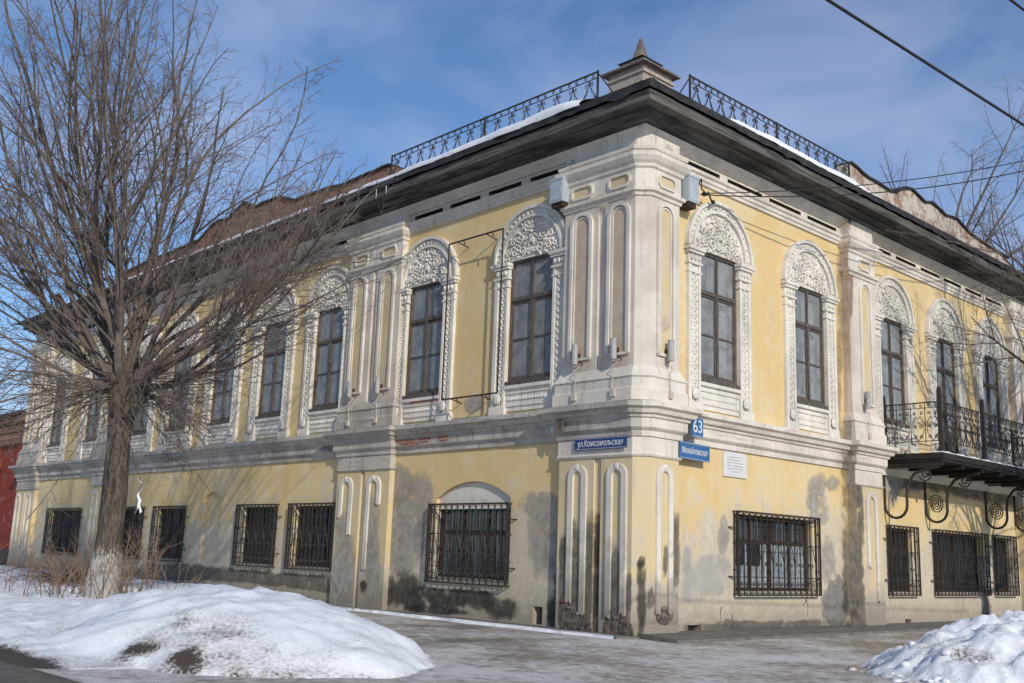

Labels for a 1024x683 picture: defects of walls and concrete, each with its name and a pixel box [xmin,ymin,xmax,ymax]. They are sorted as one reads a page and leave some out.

leakage [130,502,515,619]
leakage [526,492,655,633]
flaking render [559,594,634,636]
leakage [663,517,681,585]
leakage [846,421,866,626]